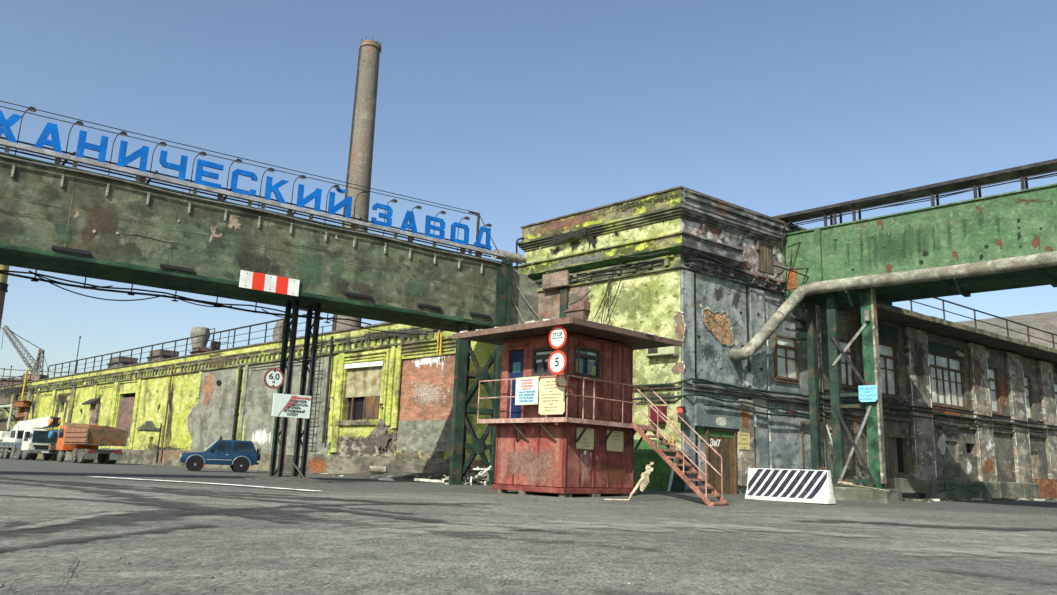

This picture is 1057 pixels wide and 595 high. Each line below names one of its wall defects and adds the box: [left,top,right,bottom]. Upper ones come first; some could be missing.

water stain [235,249,277,274]
water stain [550,237,597,255]
spalling [673,299,745,347]
flaking render [185,351,397,456]
spalling [411,377,450,408]